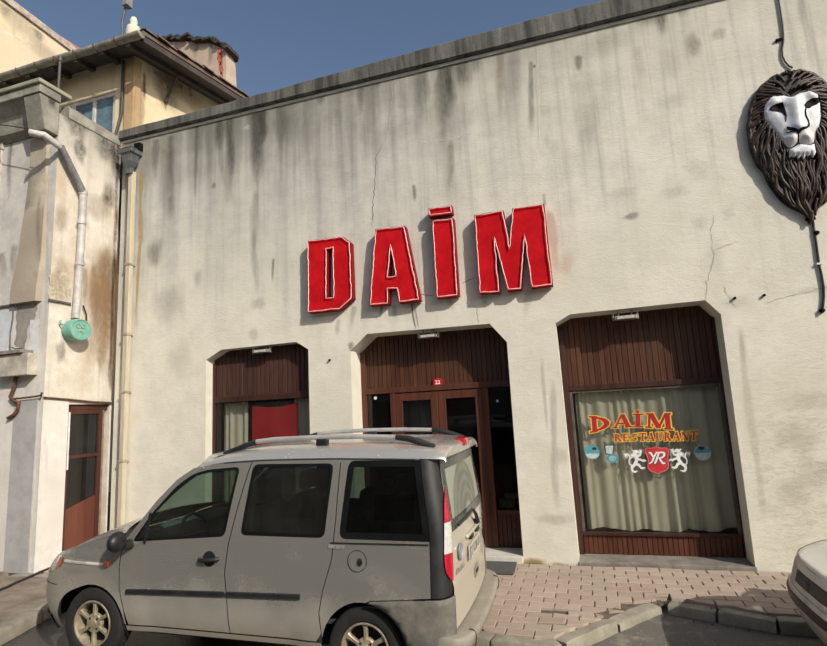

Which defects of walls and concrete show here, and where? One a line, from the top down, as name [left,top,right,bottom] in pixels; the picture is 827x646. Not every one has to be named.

water stain [440,57,467,106]
crack [372,85,393,222]
crack [705,216,739,303]
peeling [0,304,40,371]